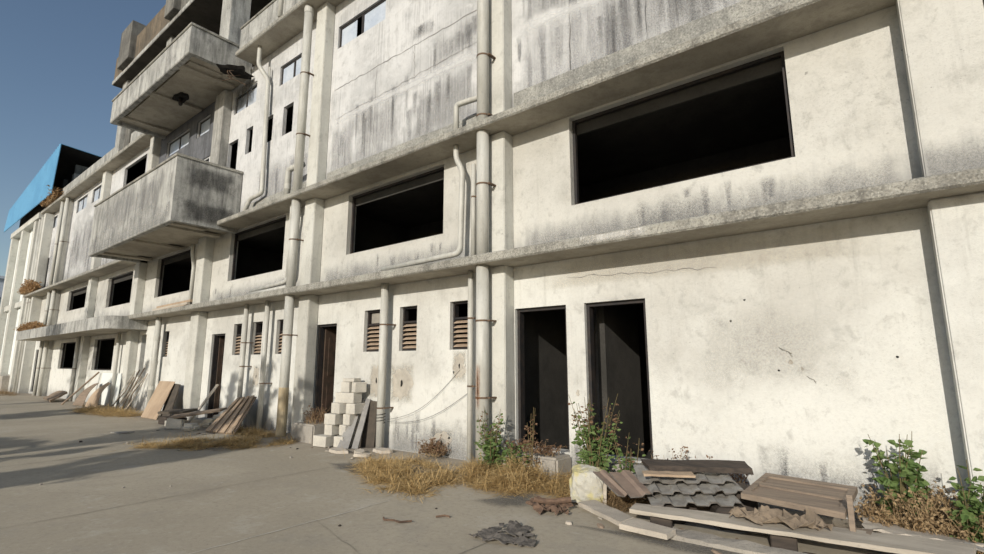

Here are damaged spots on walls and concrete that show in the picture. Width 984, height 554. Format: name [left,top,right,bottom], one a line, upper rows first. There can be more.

leakage [192,171,232,191]
leakage [187,202,229,223]